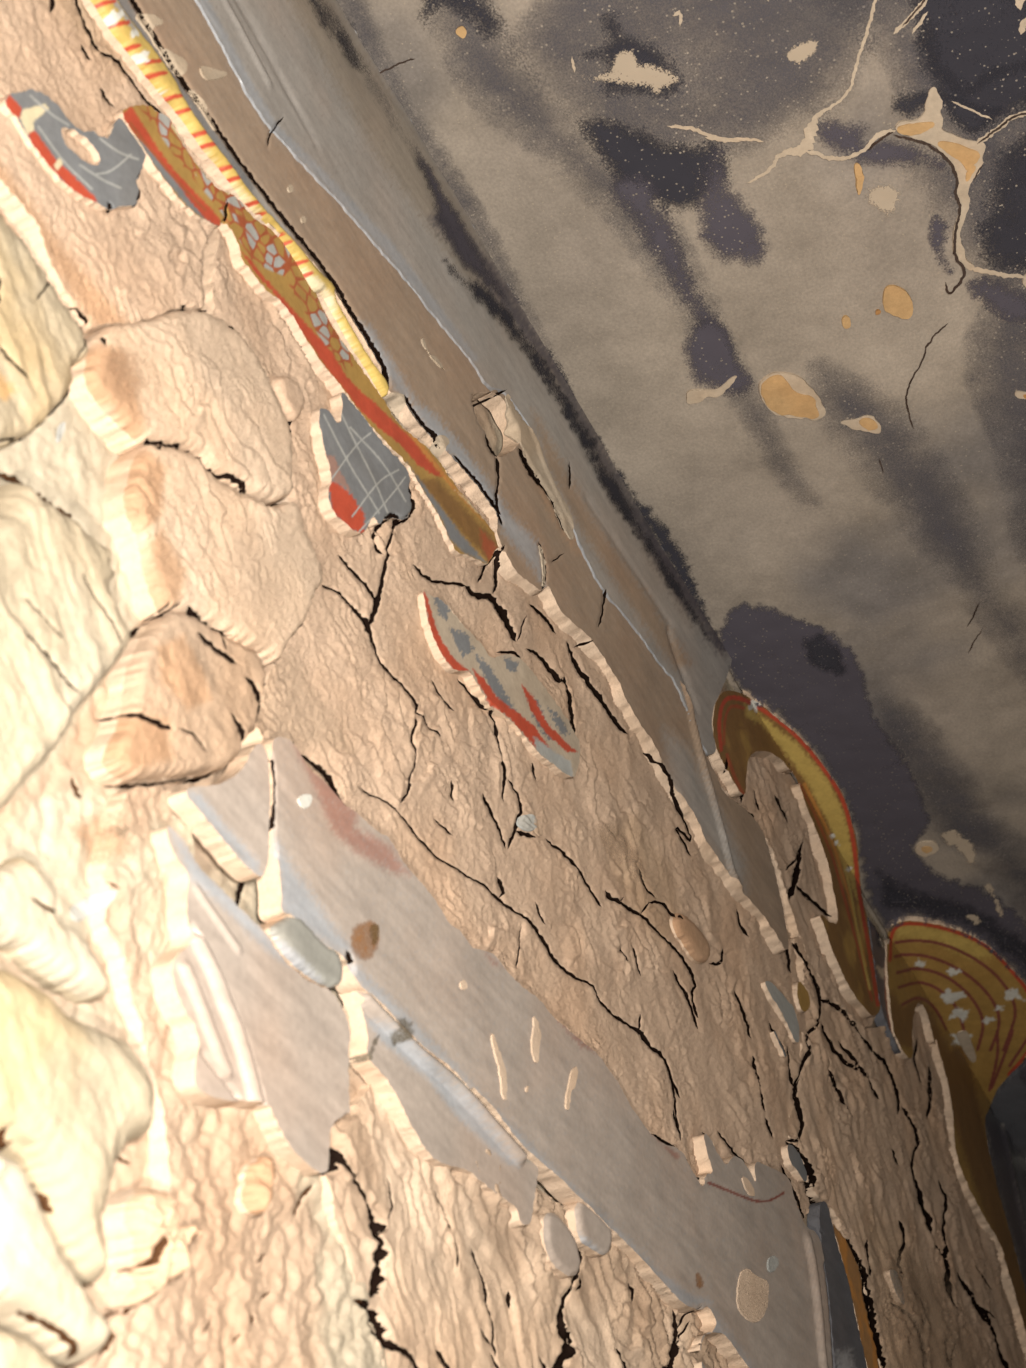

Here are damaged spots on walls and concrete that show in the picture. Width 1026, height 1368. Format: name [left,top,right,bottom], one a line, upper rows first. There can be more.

spalling [0,0,357,409]
peeling [136,0,691,721]
crack [668,0,1026,428]
spalling [854,162,864,195]
spalling [895,87,986,271]
spalling [202,228,1026,1368]
crack [723,759,831,917]
crack [294,1147,450,1368]
spalling [66,786,749,1368]
crack [539,1249,582,1368]
crack [662,1307,700,1368]
crack [734,942,1009,1368]